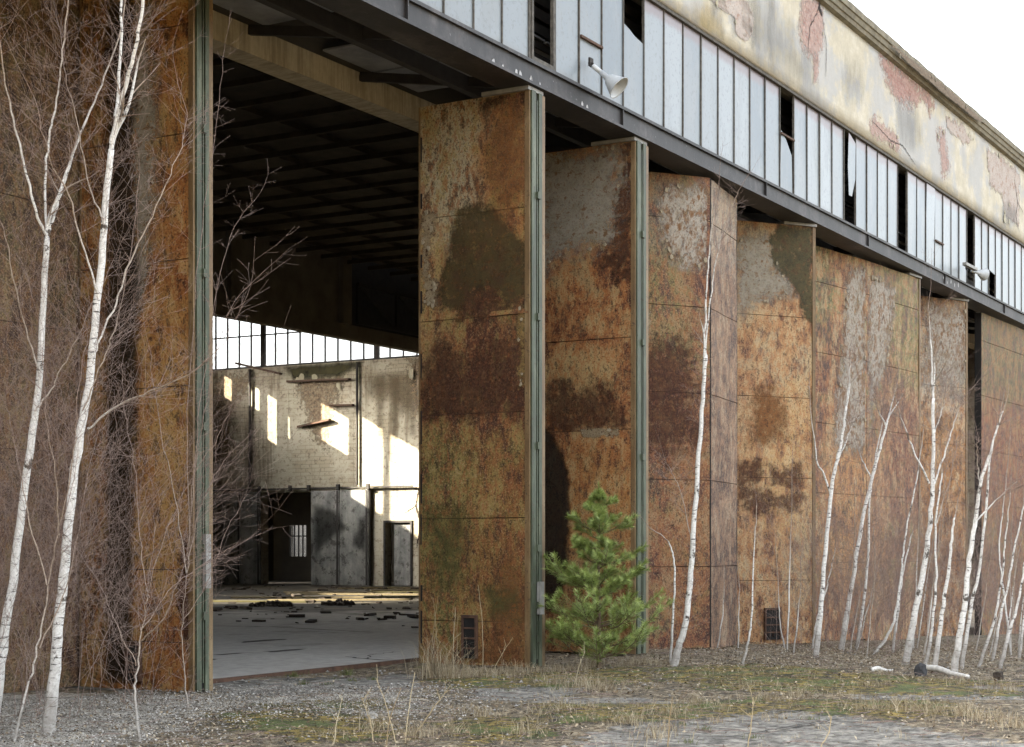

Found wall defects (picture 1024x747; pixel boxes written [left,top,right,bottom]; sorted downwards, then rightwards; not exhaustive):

flaking render [711,0,754,41]
flaking render [798,0,824,82]
flaking render [869,114,900,152]
flaking render [879,46,986,180]
rust [599,142,631,285]
flaking render [987,147,1020,227]
water stain [439,203,525,309]
water stain [769,225,813,323]
rust [545,378,627,431]
rust [648,335,702,467]
rust [750,386,787,444]
rust [738,458,805,514]